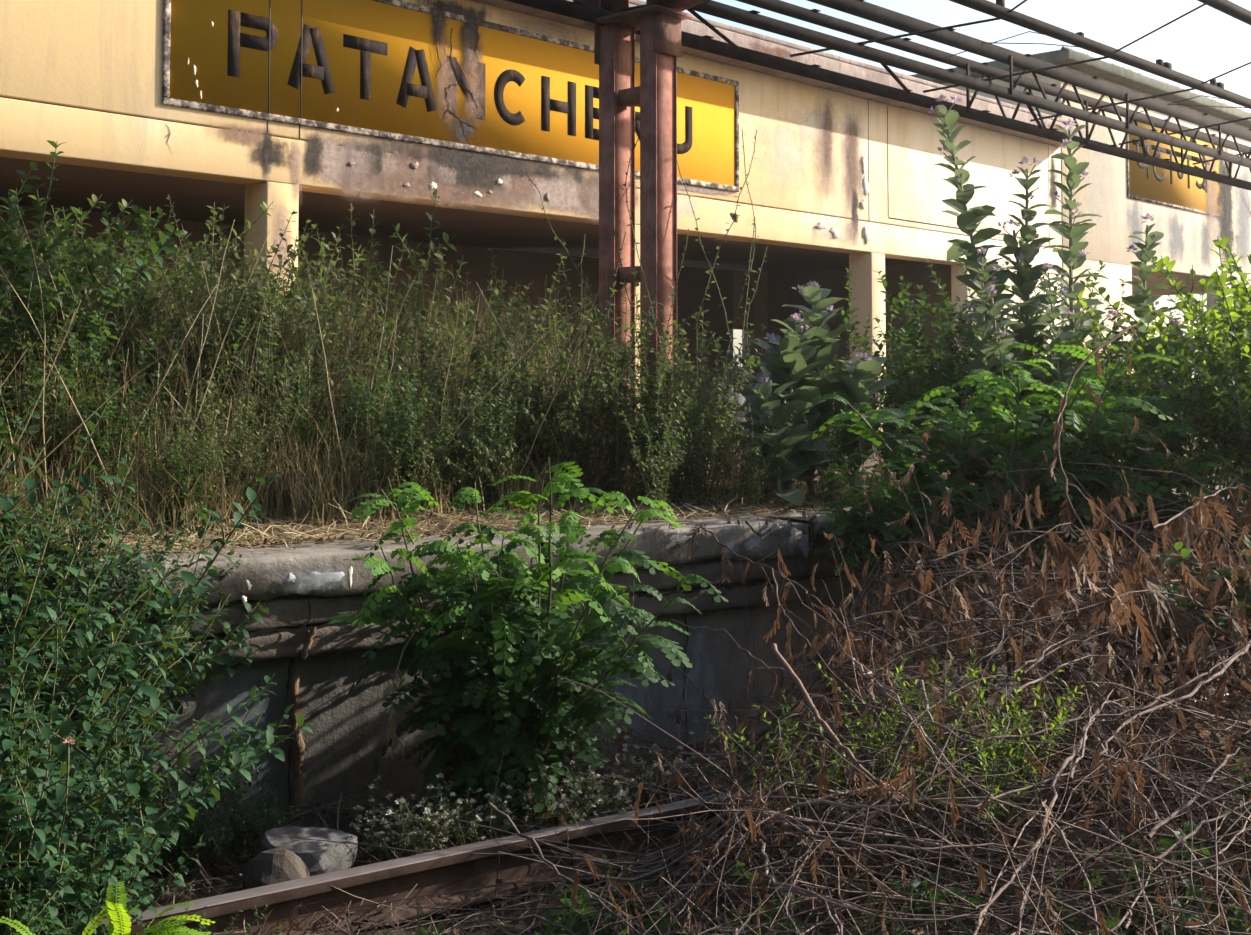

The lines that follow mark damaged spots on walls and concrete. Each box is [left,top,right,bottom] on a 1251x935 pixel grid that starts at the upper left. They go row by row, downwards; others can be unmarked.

leakage [419,0,486,142]
leakage [819,113,861,232]
leakage [1171,218,1183,258]
leakage [1203,148,1251,262]